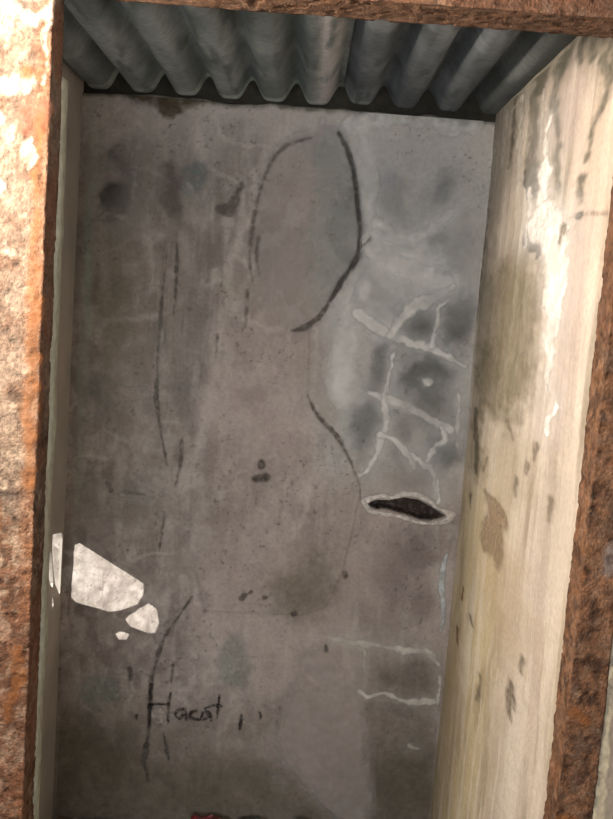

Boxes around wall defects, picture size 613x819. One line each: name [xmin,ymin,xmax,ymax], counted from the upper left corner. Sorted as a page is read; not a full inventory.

leakage [590,42,613,113]
crack [249,138,307,269]
crack [292,132,369,331]
leakage [494,36,587,384]
crack [311,403,356,474]
leakage [474,261,532,472]
leakage [544,402,559,437]
spalling [361,491,457,525]